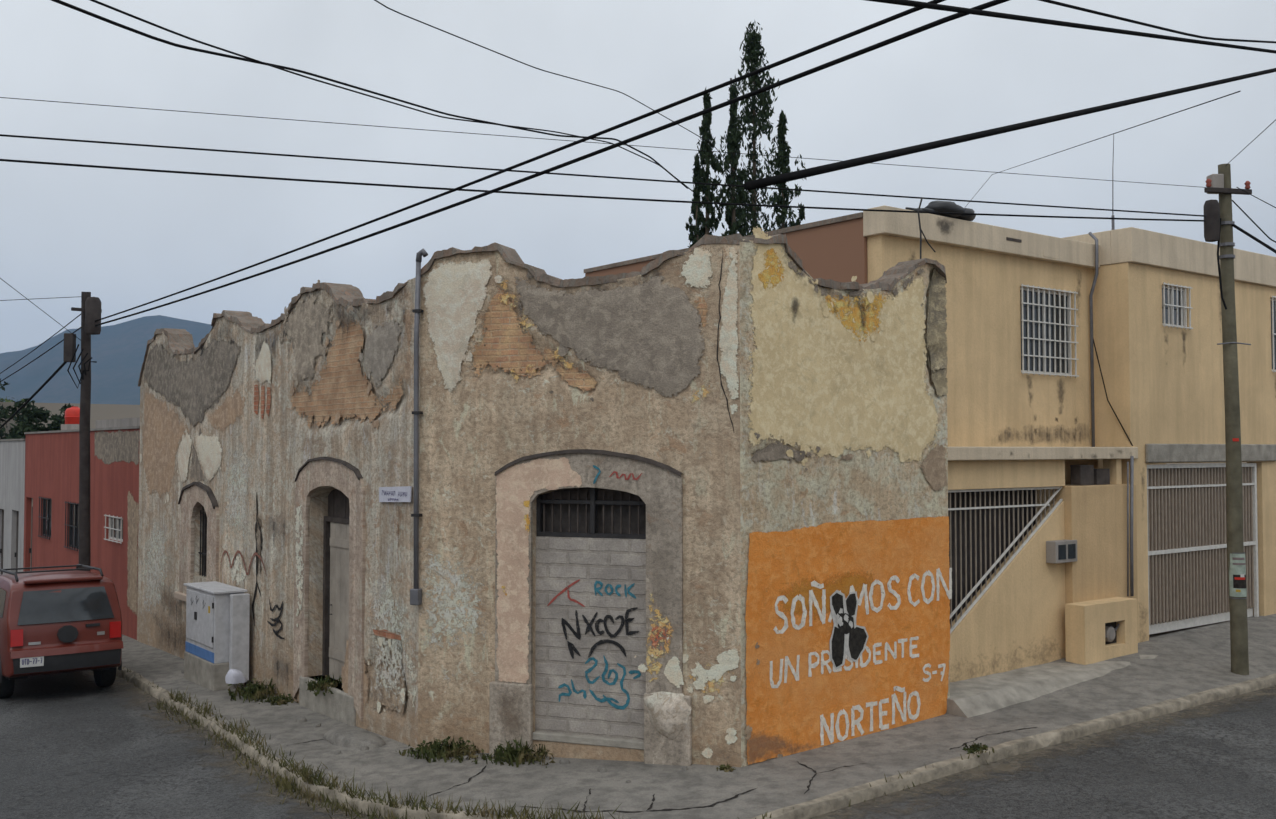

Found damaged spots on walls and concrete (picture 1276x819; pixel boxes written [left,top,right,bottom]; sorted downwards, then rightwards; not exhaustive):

peeling [290,259,597,430]
peeling [676,228,948,491]
flaking render [94,430,139,465]
peeling [127,491,139,615]
spalling [363,628,417,716]
spalling [692,725,752,764]